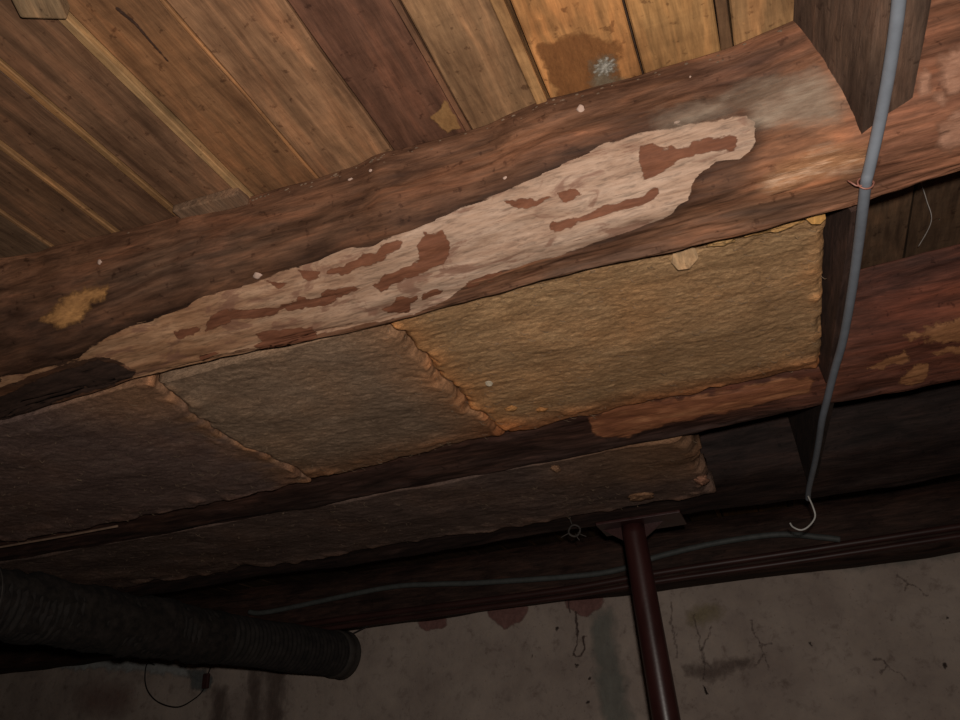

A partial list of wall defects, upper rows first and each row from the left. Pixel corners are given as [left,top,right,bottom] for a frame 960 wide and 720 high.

water stain [537,34,621,96]
peeling [74,81,832,379]
peeling [0,365,63,387]
peeling [867,317,960,385]